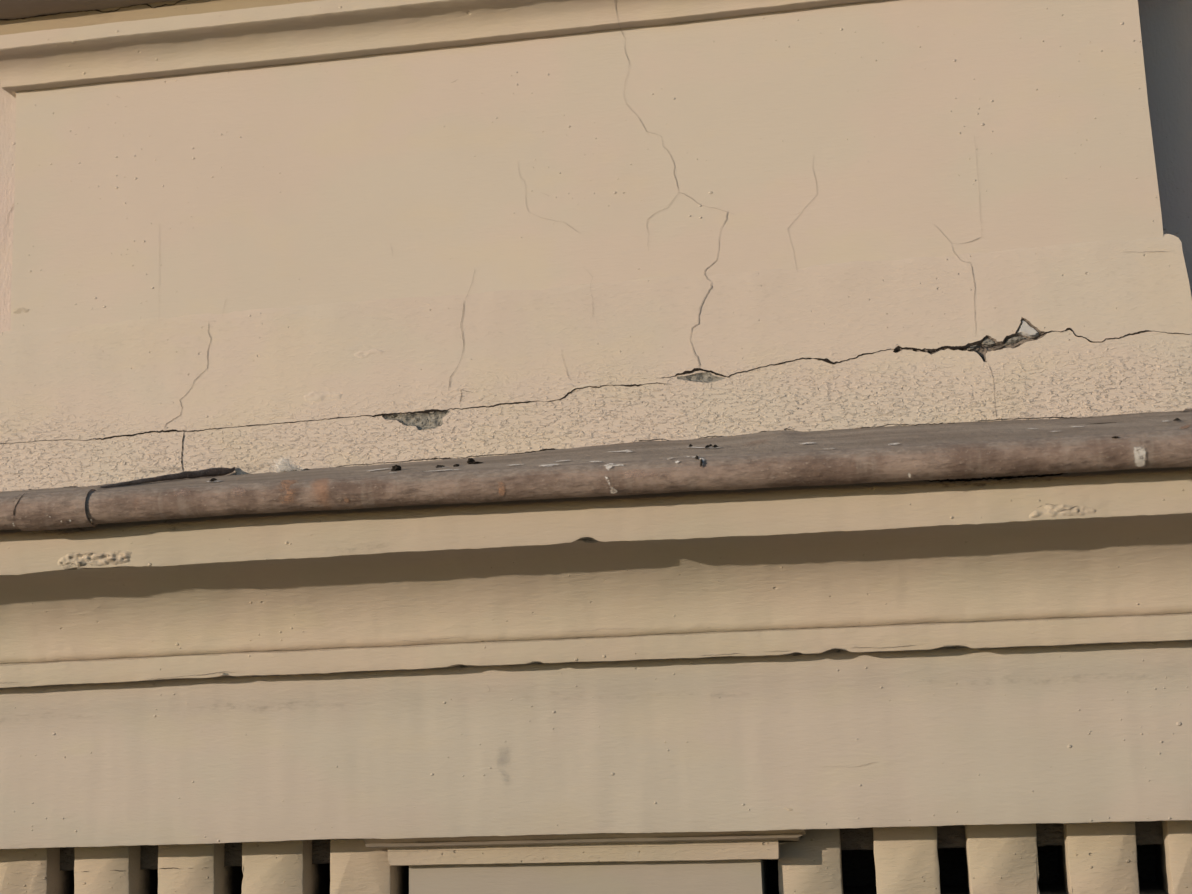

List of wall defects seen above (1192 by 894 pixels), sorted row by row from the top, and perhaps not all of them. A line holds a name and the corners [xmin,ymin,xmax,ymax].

crack [0,0,1137,470]
flaking render [893,317,1047,362]
crack [1038,326,1190,344]
flaking render [677,372,725,383]
flaking render [381,411,450,430]